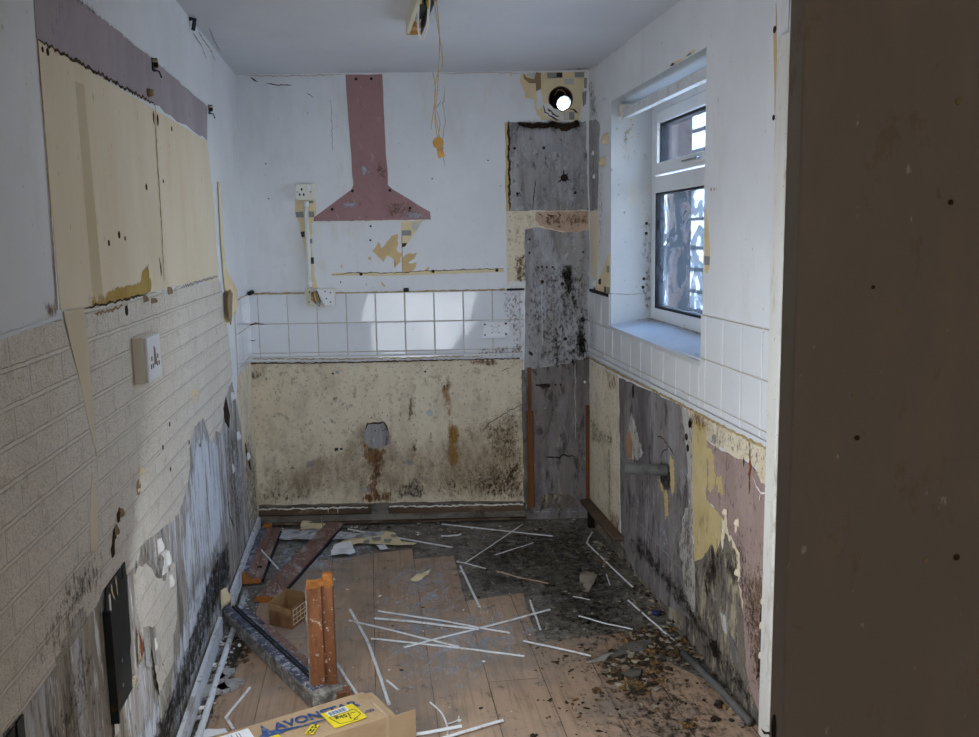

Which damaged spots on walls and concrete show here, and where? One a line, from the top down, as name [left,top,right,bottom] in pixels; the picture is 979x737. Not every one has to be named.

flaking render [33,0,219,310]
flaking render [295,74,431,288]
peeling [510,72,578,120]
water stain [46,551,102,643]
flaking render [0,382,256,737]
corrosion [363,445,391,502]
water stain [441,385,523,497]
flaking render [619,378,693,620]
water stain [624,509,759,726]
flaking render [706,440,766,711]